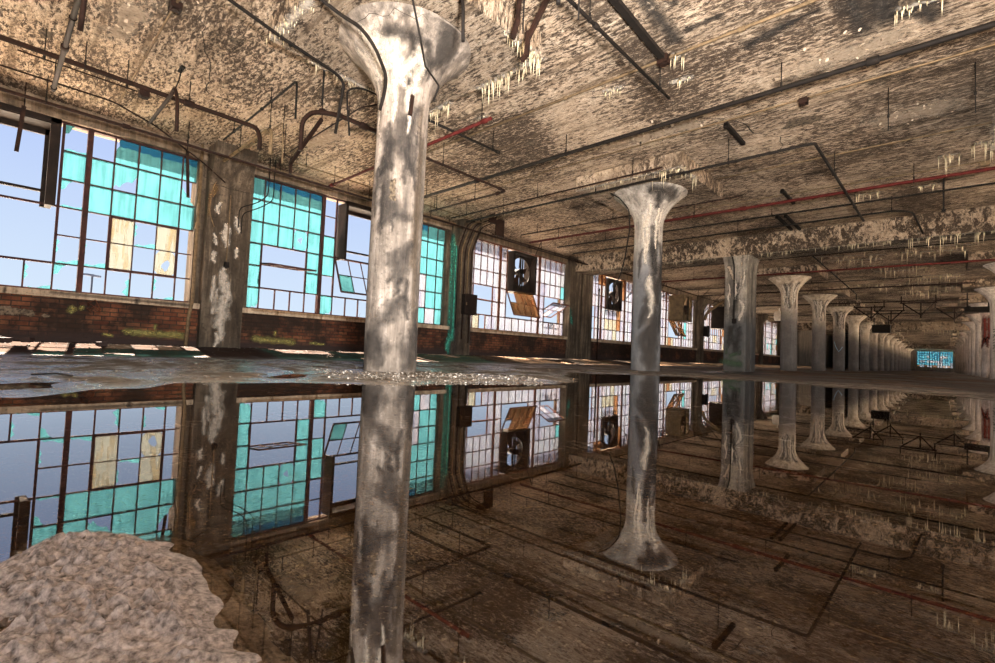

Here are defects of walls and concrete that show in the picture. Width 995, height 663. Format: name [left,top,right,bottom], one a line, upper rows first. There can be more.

damp [835,0,940,34]
damp [357,22,458,234]
damp [363,243,417,372]
damp [638,185,676,369]